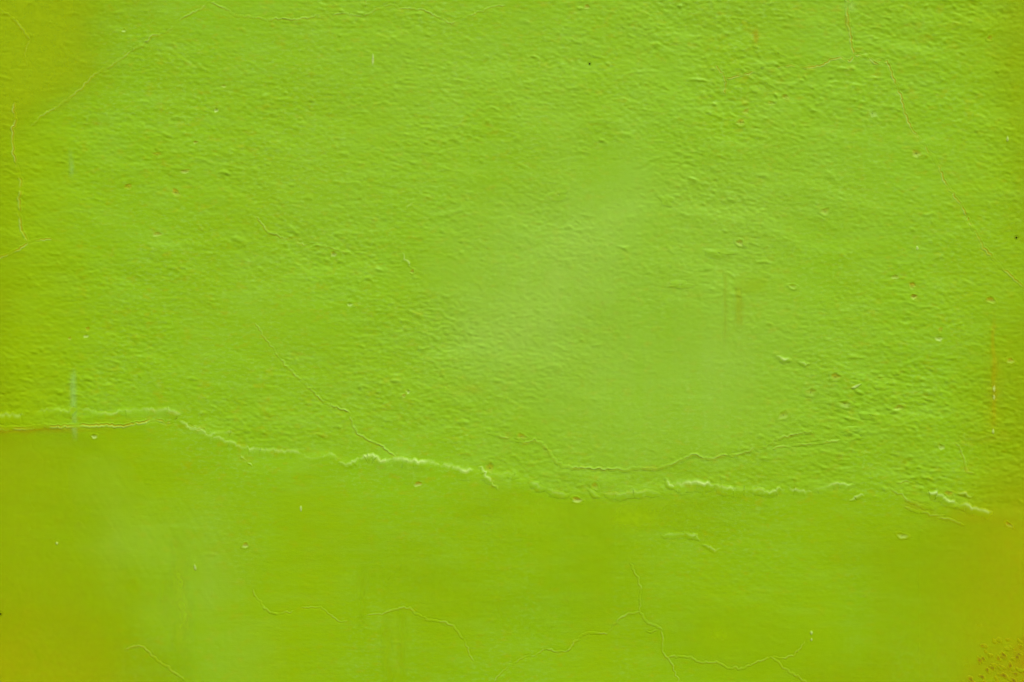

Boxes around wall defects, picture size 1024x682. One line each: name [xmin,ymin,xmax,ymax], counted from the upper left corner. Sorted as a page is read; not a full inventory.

flaking render [0,406,499,490]
flaking render [664,477,866,502]
flaking render [927,490,993,520]
crack [252,589,475,662]
crack [493,563,807,682]